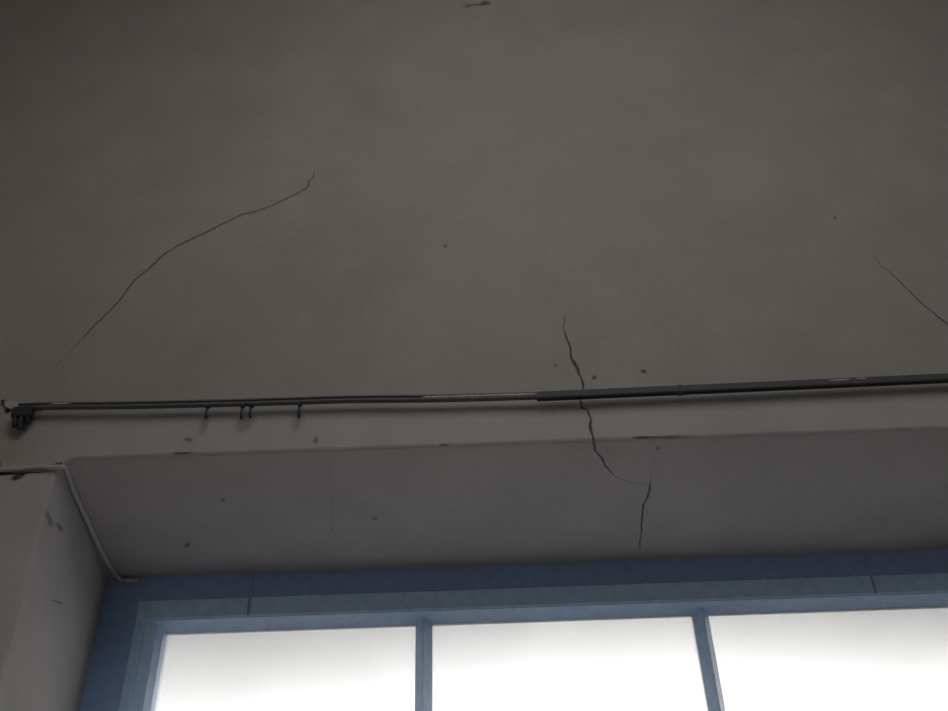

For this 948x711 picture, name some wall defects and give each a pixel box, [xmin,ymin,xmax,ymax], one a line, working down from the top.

crack [86,179,311,334]
crack [564,317,616,477]
crack [640,481,651,538]